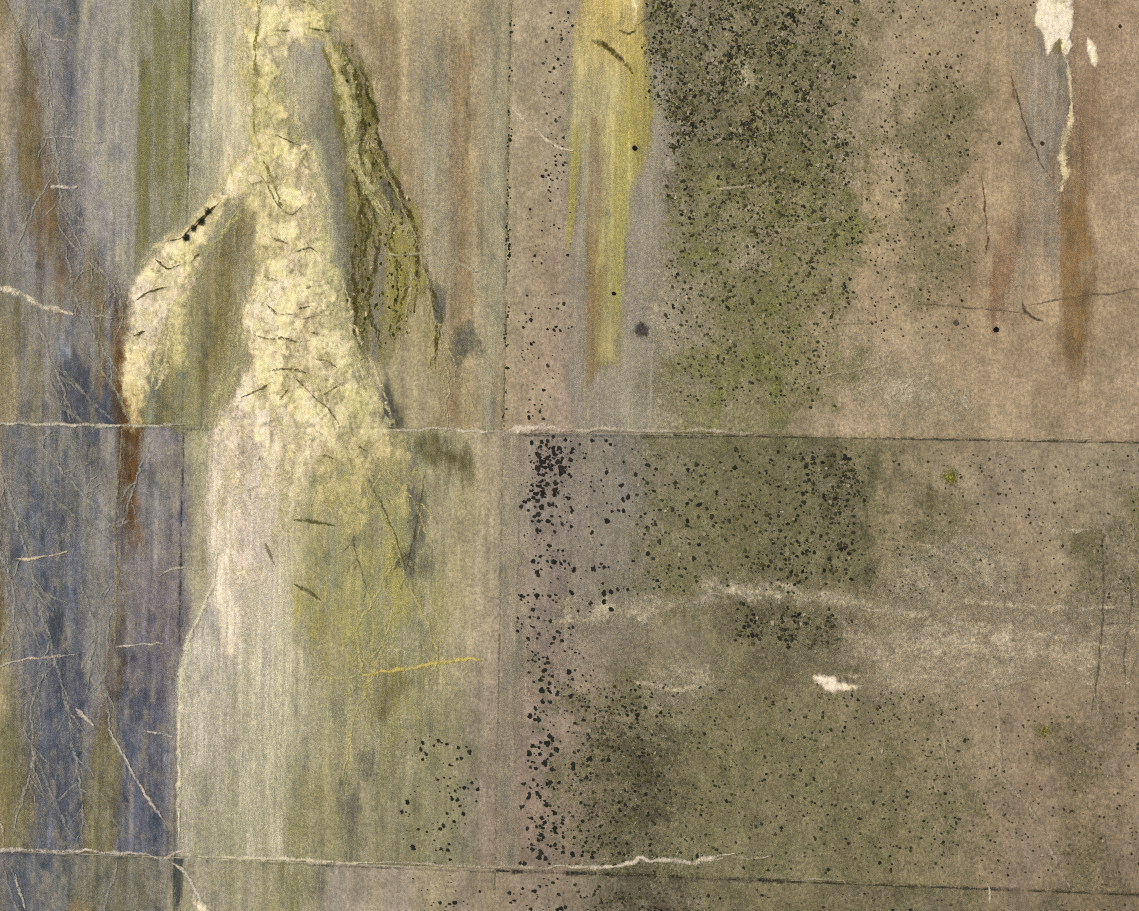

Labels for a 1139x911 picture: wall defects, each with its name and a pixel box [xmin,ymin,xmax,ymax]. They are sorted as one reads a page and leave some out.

corrosion [18,47,142,544]
leakage [434,286,445,322]
leakage [566,0,664,567]
crack [787,220,840,228]
corrosion [1060,164,1092,365]
leakage [0,0,423,911]
crack [0,9,769,911]
spalling [546,534,1139,709]
crack [1087,519,1139,713]